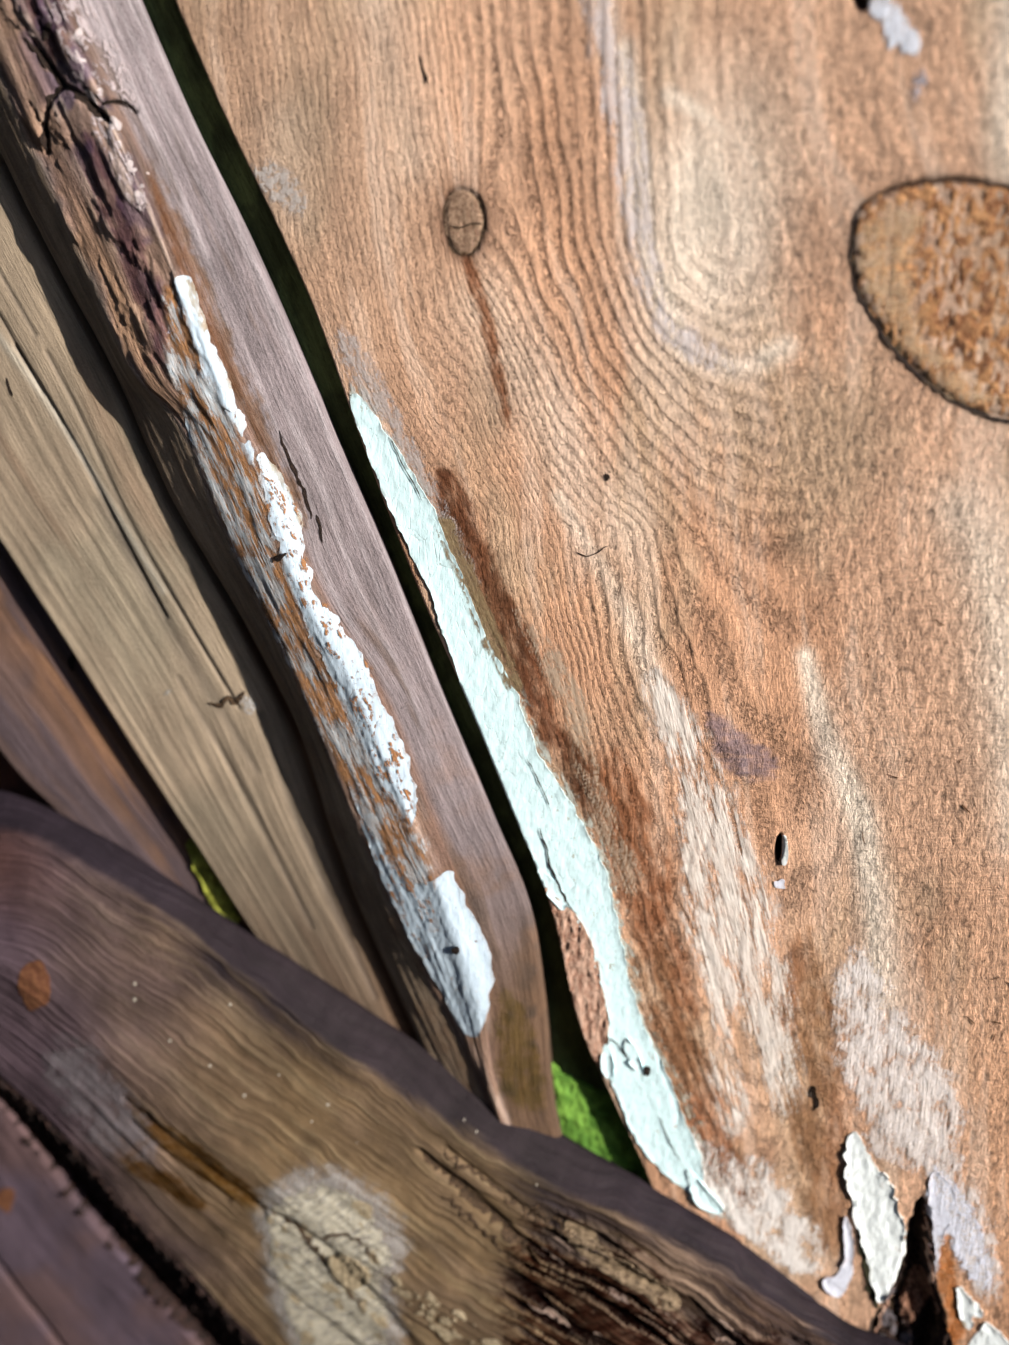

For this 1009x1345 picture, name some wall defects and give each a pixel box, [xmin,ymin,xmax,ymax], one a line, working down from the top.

crack [0,8,136,154]
peeling [163,275,495,1037]
peeling [350,385,737,1222]
peeling [822,1131,906,1303]
peeling [924,1165,1009,1345]